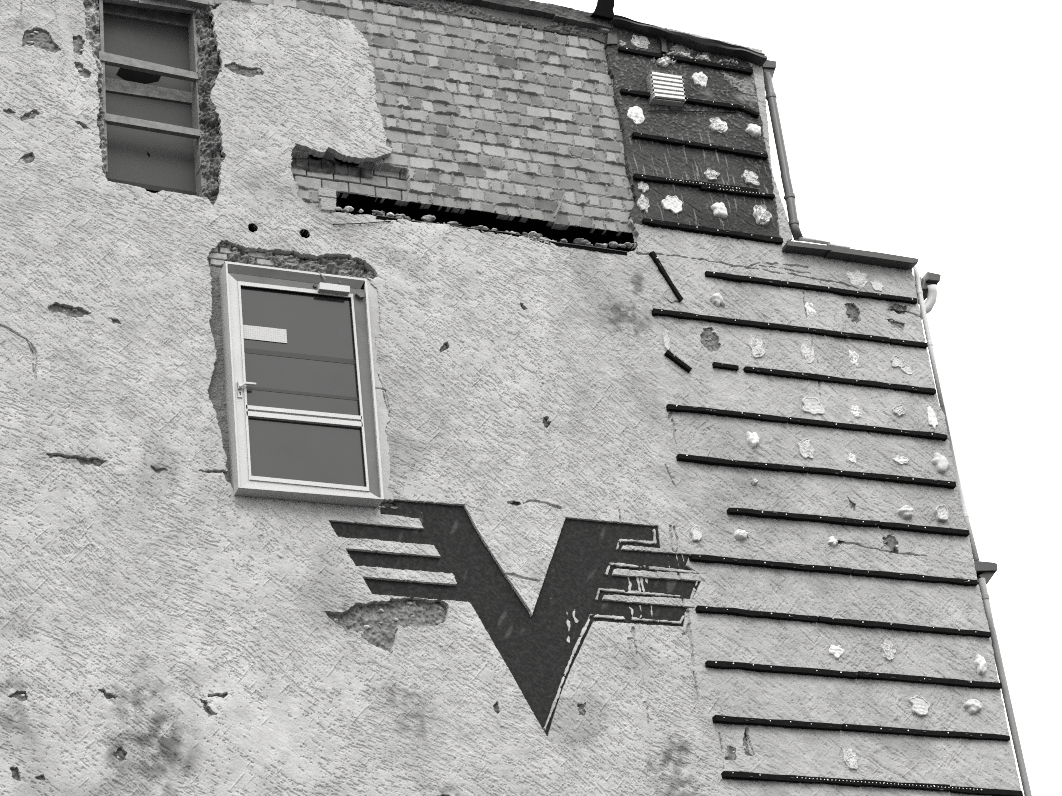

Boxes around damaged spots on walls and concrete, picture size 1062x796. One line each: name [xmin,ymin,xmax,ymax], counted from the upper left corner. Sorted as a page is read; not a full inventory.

spalling [205,243,374,484]
spalling [327,600,447,653]